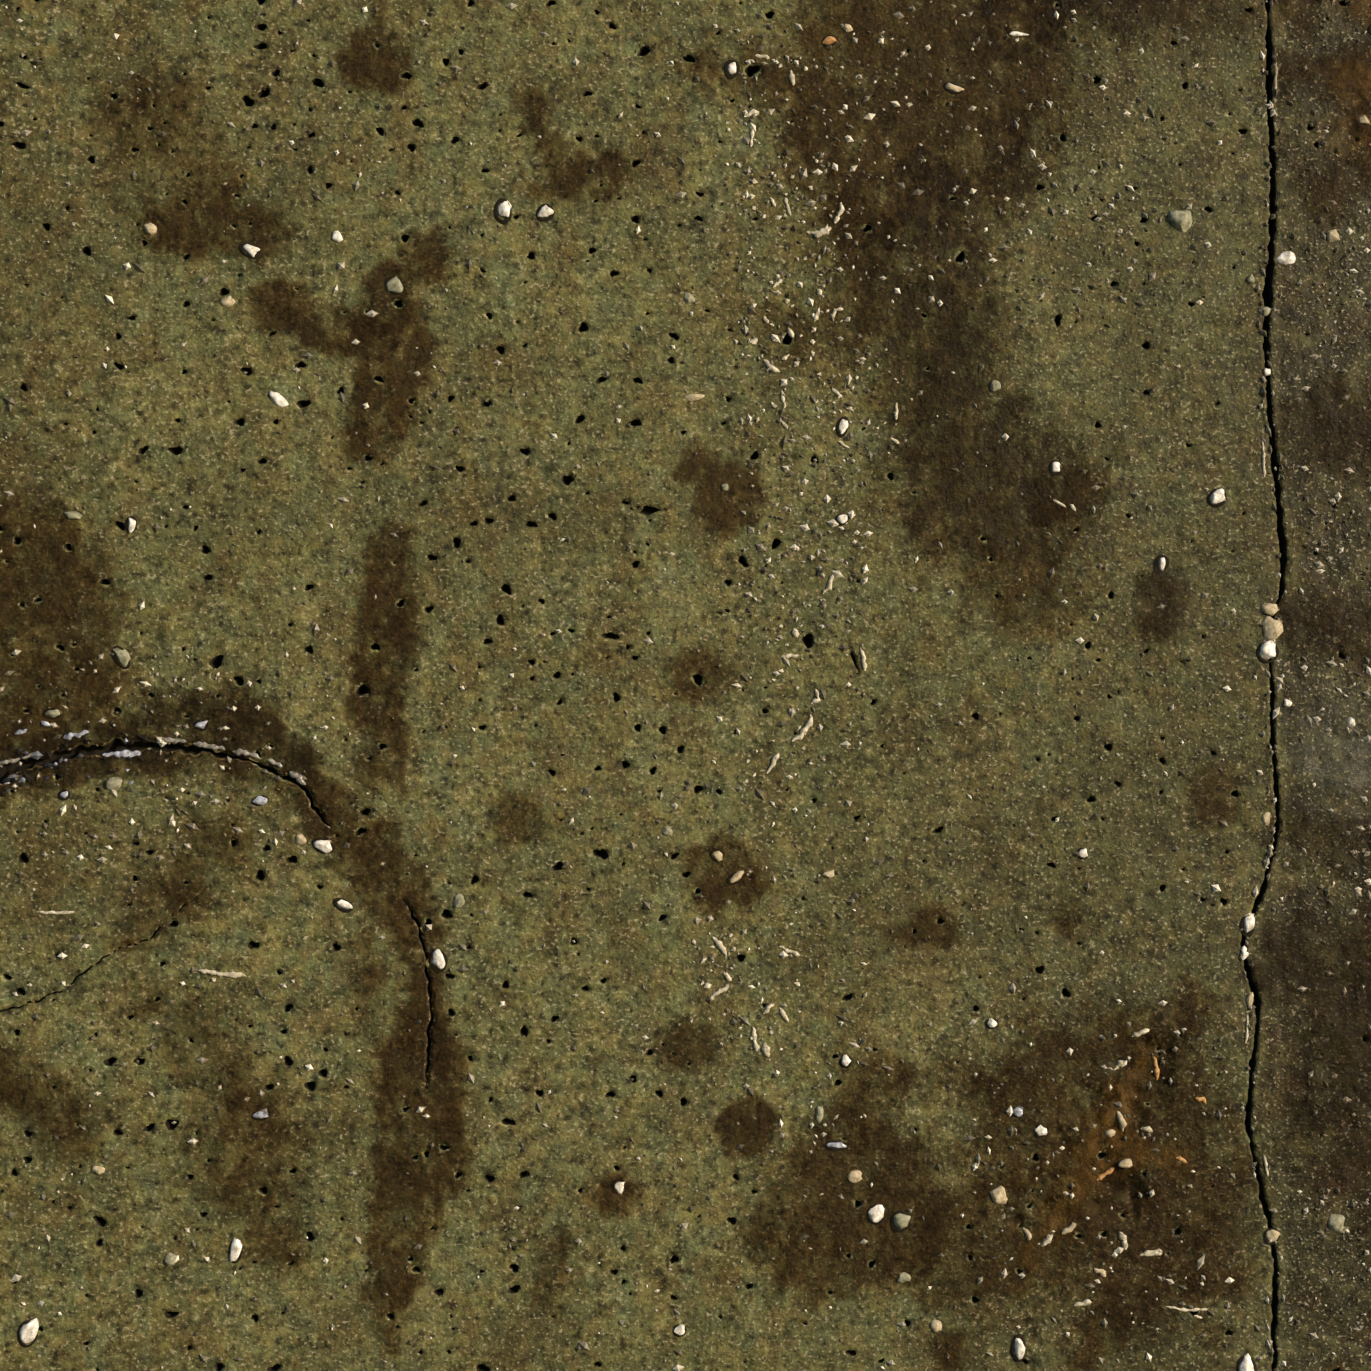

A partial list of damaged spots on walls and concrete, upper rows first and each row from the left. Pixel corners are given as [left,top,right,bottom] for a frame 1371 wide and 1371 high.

damp [726,98,761,147]
damp [734,0,1099,545]
crack [0,721,339,837]
damp [129,691,398,888]
damp [743,752,779,783]
damp [772,607,803,682]
damp [792,689,820,750]
crack [1237,0,1291,1371]
crack [0,885,208,1017]
crack [399,899,438,1087]
damp [867,1144,905,1229]
damp [1131,1232,1208,1319]